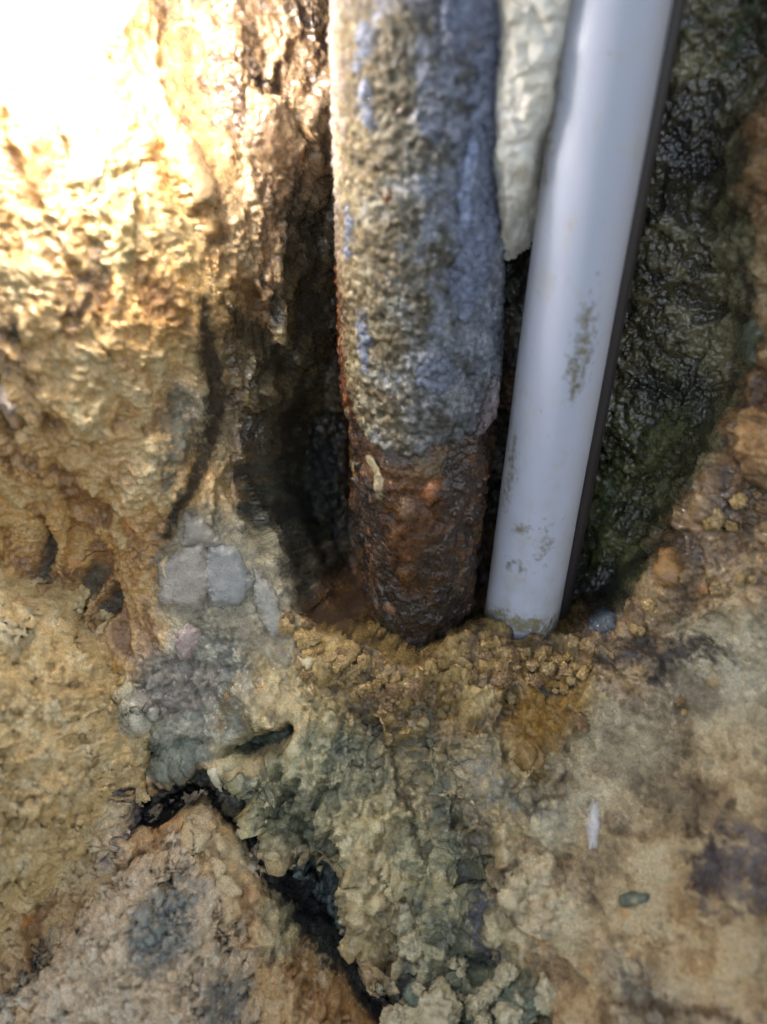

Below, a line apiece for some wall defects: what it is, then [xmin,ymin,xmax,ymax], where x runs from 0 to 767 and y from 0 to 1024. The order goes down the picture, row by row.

corrosion [365,455,443,597]
corrosion [383,601,396,615]
crack [137,783,415,1023]